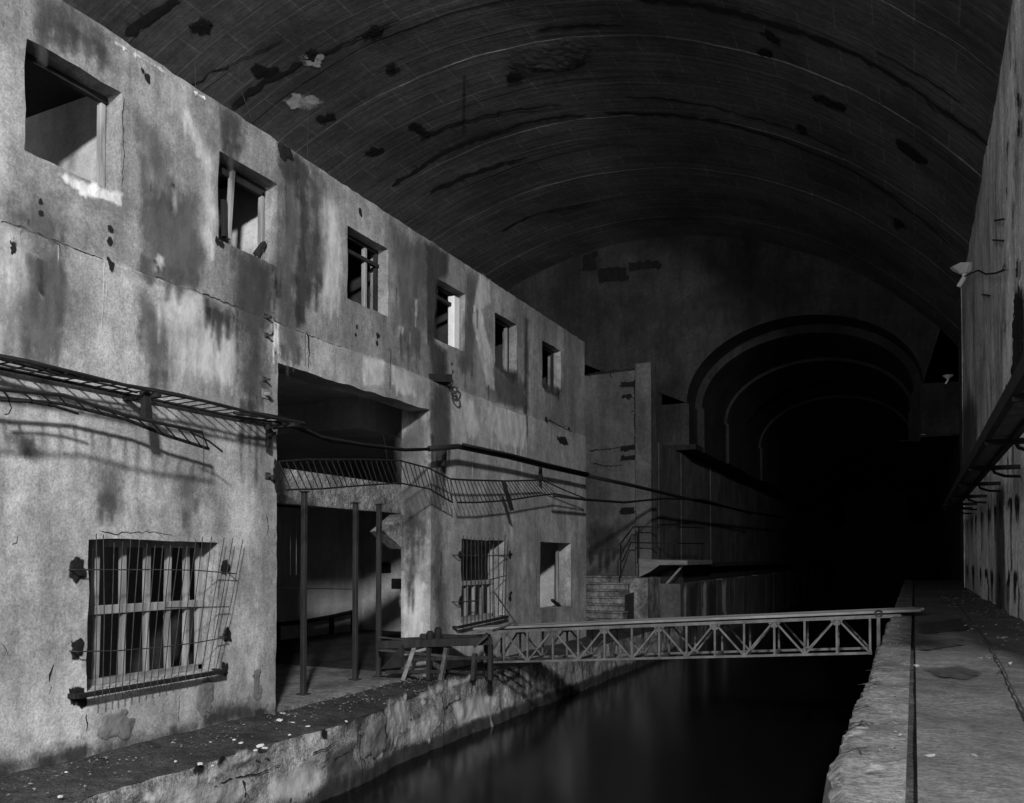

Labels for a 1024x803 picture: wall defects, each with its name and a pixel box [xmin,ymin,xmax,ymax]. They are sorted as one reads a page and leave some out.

crack [391,96,949,245]
crack [1,221,100,258]
crack [142,272,239,317]
leakage [137,98,342,448]
crack [273,320,340,369]
leakage [995,488,1004,610]
flaking render [97,709,135,740]